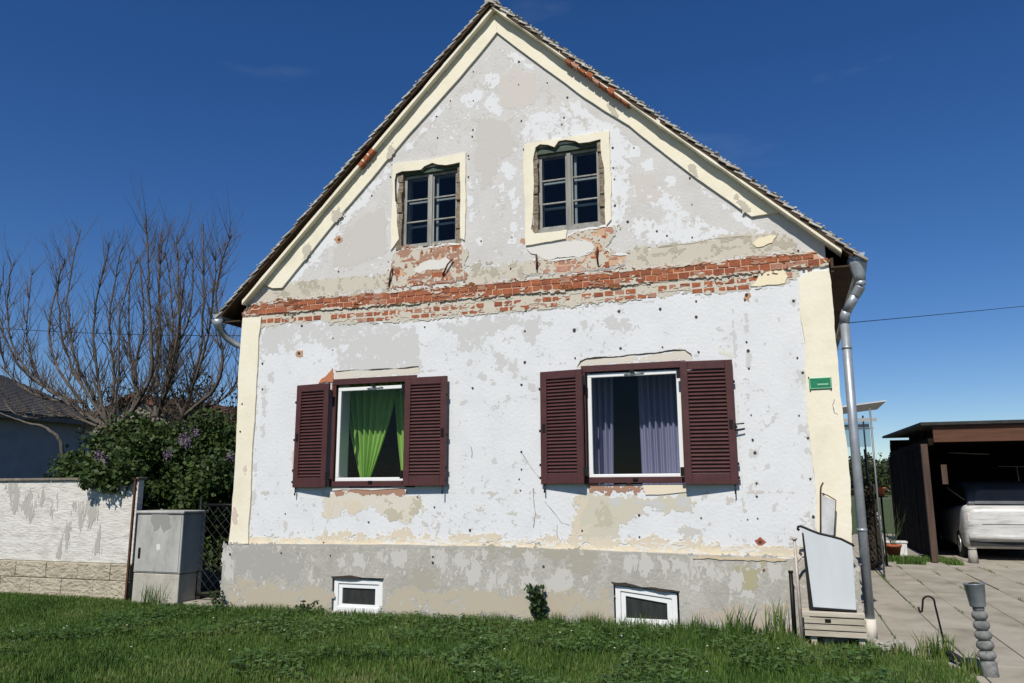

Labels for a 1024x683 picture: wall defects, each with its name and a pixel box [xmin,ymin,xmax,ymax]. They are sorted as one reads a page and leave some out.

peeling [242,52,830,438]
damp [4,481,58,523]
damp [56,498,103,560]
spalling [316,483,792,599]